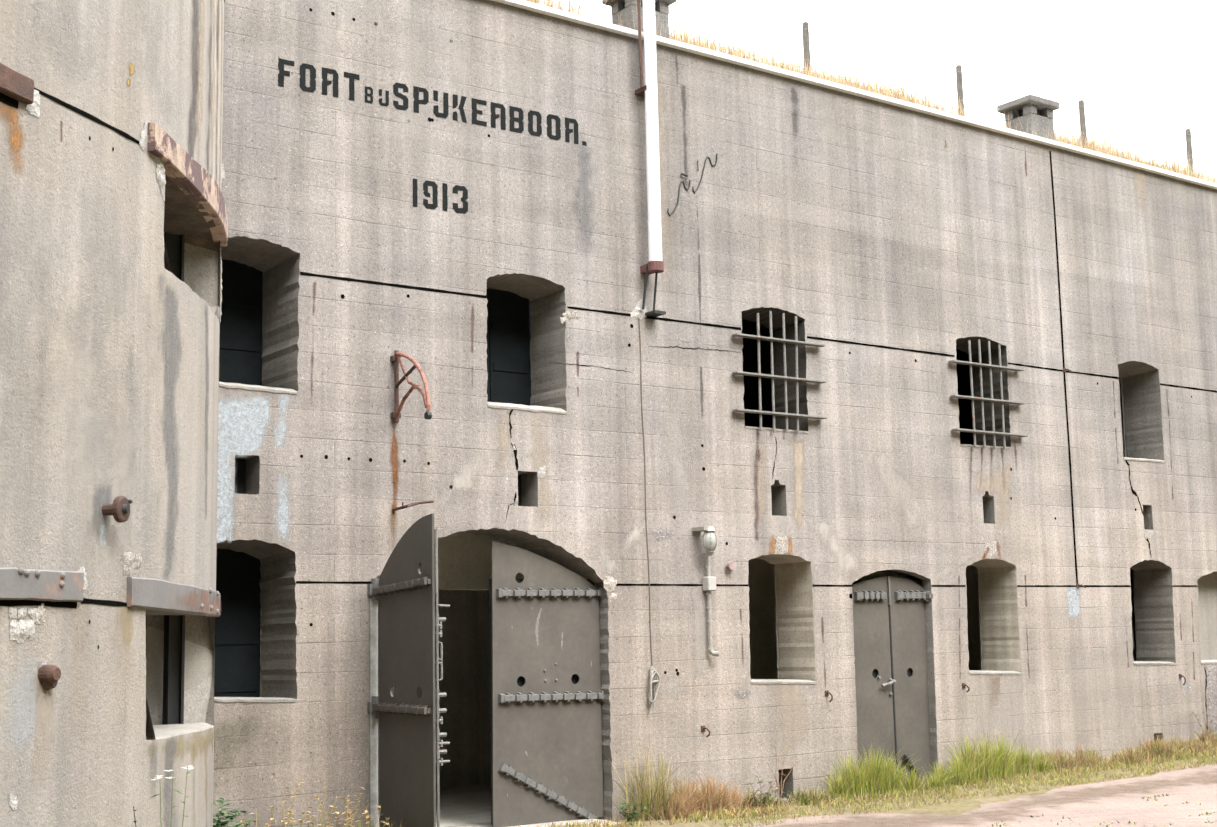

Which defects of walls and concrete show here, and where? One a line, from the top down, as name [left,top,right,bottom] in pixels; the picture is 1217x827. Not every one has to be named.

corrosion [0,106,21,161]
spalling [26,89,41,118]
leakage [206,325,288,541]
corrosion [391,422,399,513]
crack [505,409,519,522]
crack [1125,460,1153,555]
spalling [123,551,143,577]
spalling [9,603,47,643]